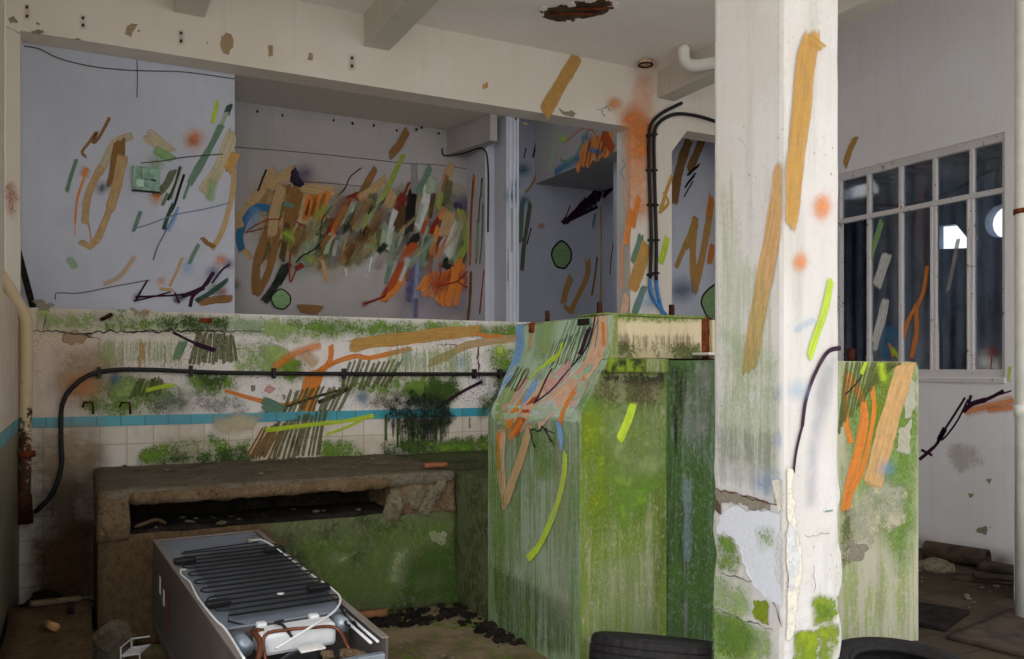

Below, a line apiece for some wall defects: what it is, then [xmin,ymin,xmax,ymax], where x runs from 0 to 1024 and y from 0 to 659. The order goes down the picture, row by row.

spalling [534,0,619,23]
peeling [206,33,234,55]
crack [33,315,261,366]
water stain [149,392,248,415]
water stain [590,369,666,412]
spalling [369,478,456,522]
peeling [714,468,803,641]